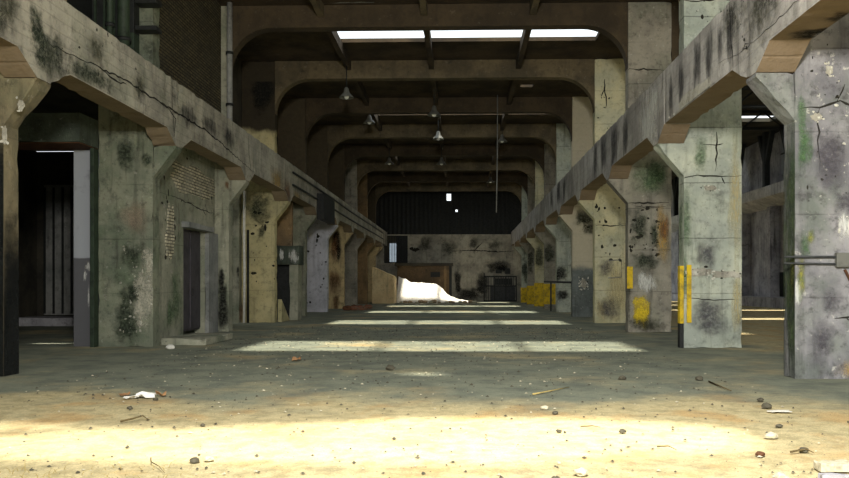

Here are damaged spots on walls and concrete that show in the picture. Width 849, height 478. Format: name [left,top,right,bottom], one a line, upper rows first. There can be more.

water stain [31,8,111,93]
crack [685,0,797,62]
crack [50,44,254,172]
crack [685,132,741,184]
crack [804,85,849,159]
mould [117,283,146,338]